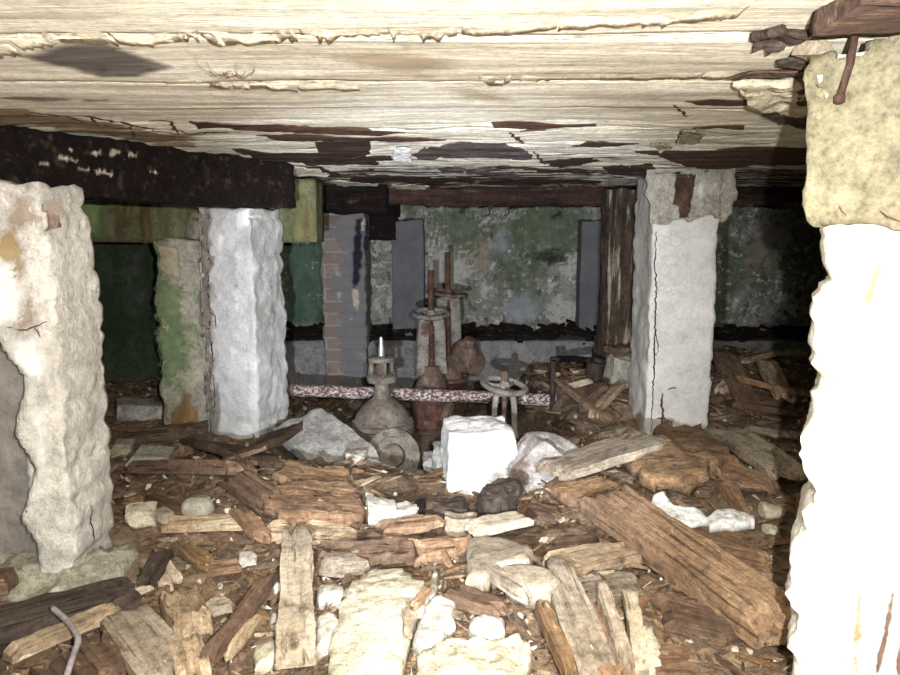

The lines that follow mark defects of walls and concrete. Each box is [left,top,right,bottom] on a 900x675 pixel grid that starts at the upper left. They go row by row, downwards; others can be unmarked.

peeling [0,6,749,59]
water stain [26,44,167,77]
peeling [257,133,447,187]
peeling [466,141,639,186]
water stain [542,250,564,263]
crack [6,321,47,337]
crack [650,232,676,432]
corrosion [171,394,197,425]